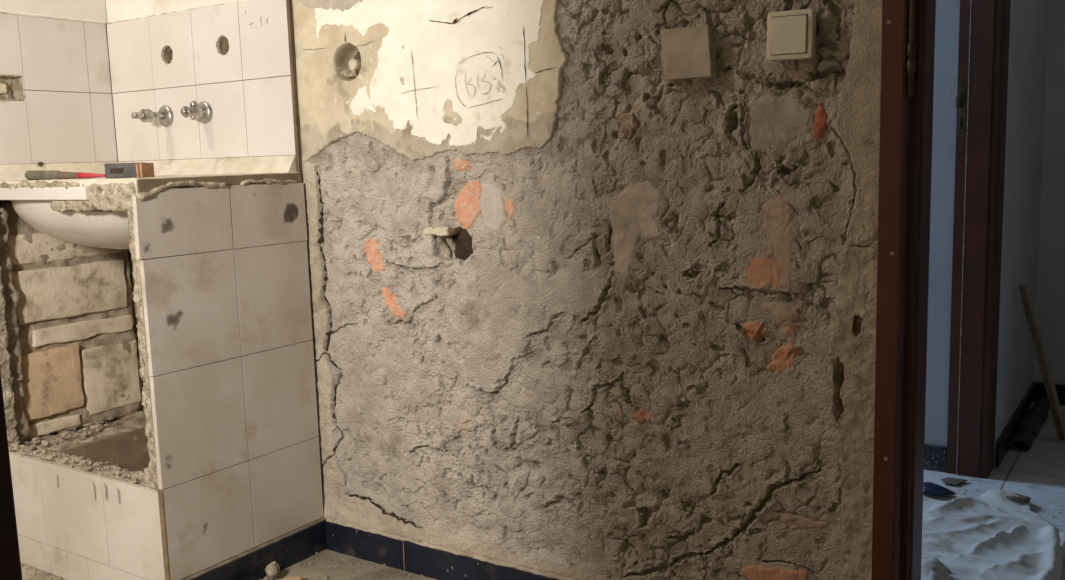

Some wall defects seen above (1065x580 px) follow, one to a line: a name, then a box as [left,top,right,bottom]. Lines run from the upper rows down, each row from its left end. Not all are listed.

spalling [163,45,173,64]
spalling [218,36,229,55]
flaking render [0,183,307,441]
crack [315,172,353,467]
flaking render [299,0,857,580]
spalling [853,315,863,337]
crack [345,481,423,528]
crack [761,559,814,572]